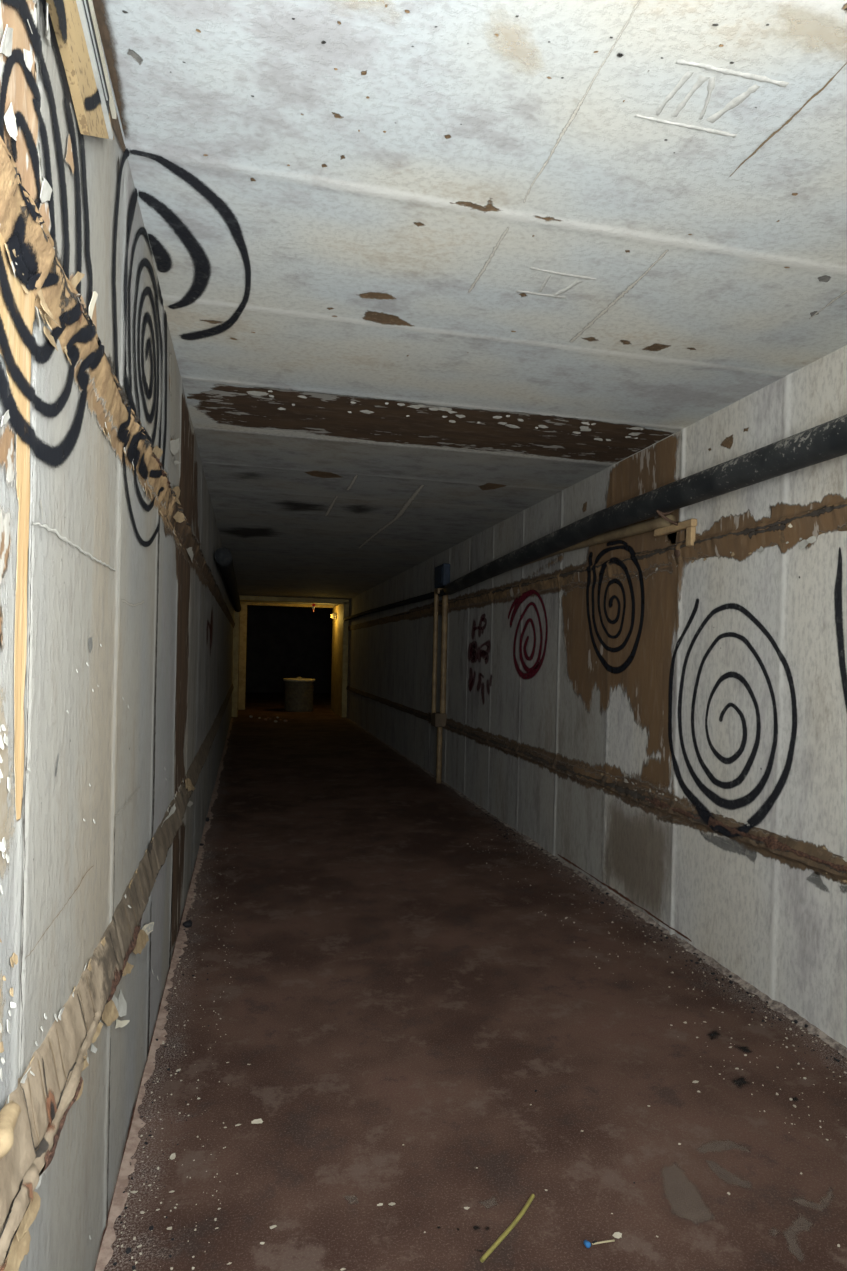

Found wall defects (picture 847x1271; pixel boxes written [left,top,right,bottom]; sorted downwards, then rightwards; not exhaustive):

peeling [127,49,143,65]
peeling [0,0,52,233]
peeling [65,134,75,175]
peeling [450,198,500,213]
crack [730,63,847,176]
peeling [356,292,414,327]
peeling [708,428,749,451]
peeling [0,233,72,821]
peeling [103,349,680,950]
peeling [561,494,847,885]
peeling [20,986,76,1083]
peeling [71,922,154,1102]